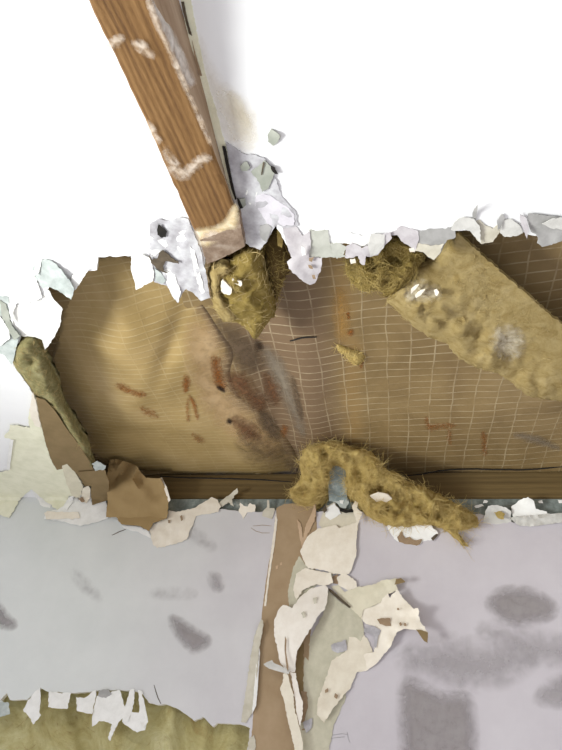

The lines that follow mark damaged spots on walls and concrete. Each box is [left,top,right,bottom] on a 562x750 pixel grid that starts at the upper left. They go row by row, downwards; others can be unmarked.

spalling [226,142,562,285]
spalling [131,217,211,303]
peeling [0,259,89,365]
corrosion [213,359,225,392]
damp [191,328,302,450]
peeling [0,393,277,606]
spalling [474,497,562,527]
damp [174,620,206,649]
peeling [241,497,428,750]
damp [492,592,551,622]
peeling [23,688,148,740]
damp [403,684,472,750]